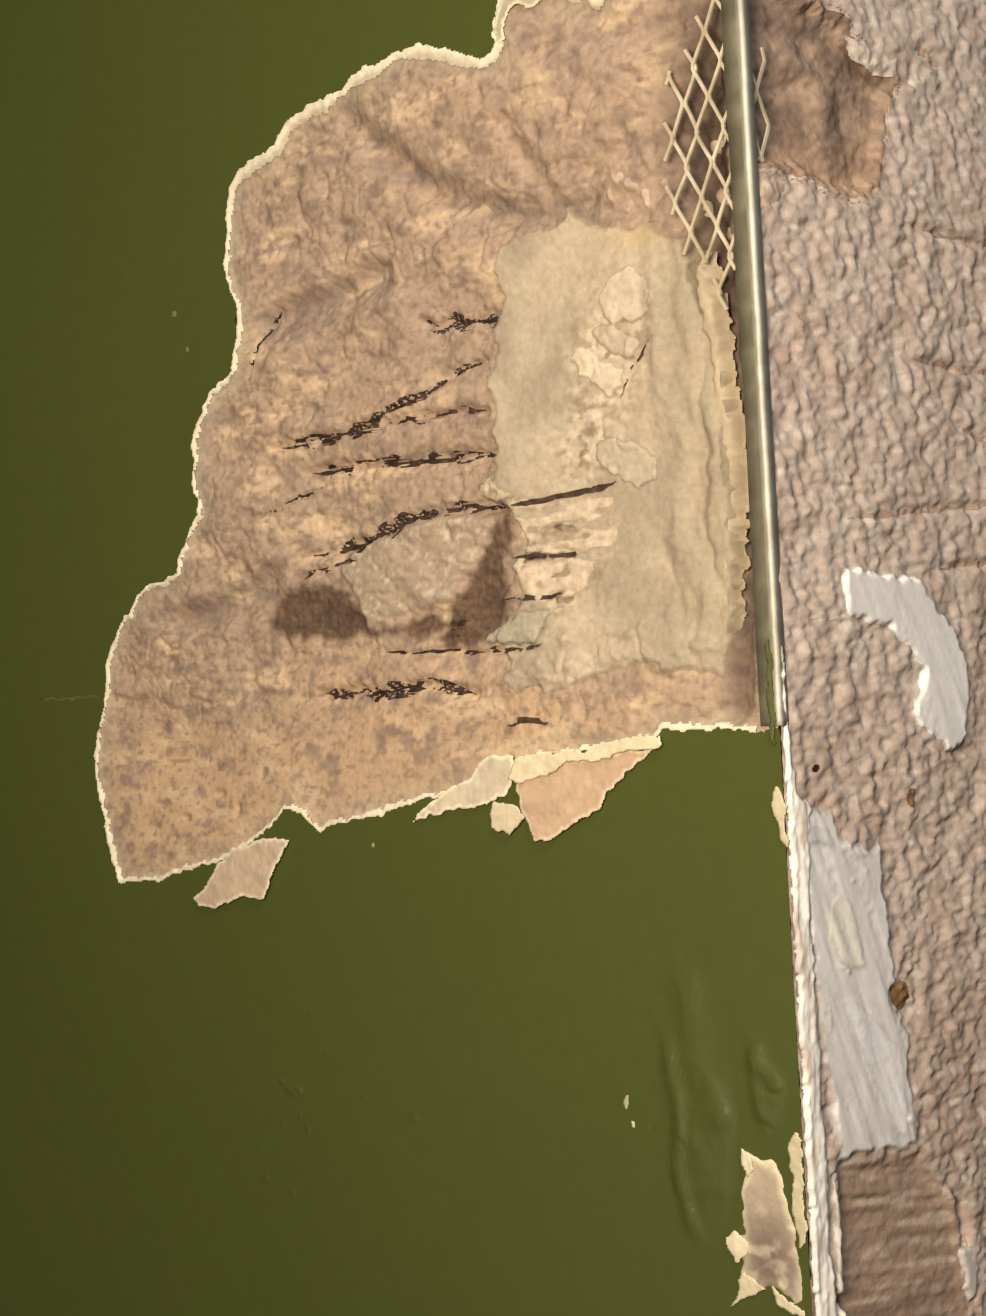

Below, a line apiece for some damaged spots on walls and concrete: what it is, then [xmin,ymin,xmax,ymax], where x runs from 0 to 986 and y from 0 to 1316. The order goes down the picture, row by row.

flaking render [749,0,936,211]
crack [249,312,282,366]
crack [270,311,499,513]
crack [326,643,542,702]
flaking render [93,0,778,909]
crack [304,481,616,580]
crack [501,592,562,601]
peeling [726,1149,806,1316]